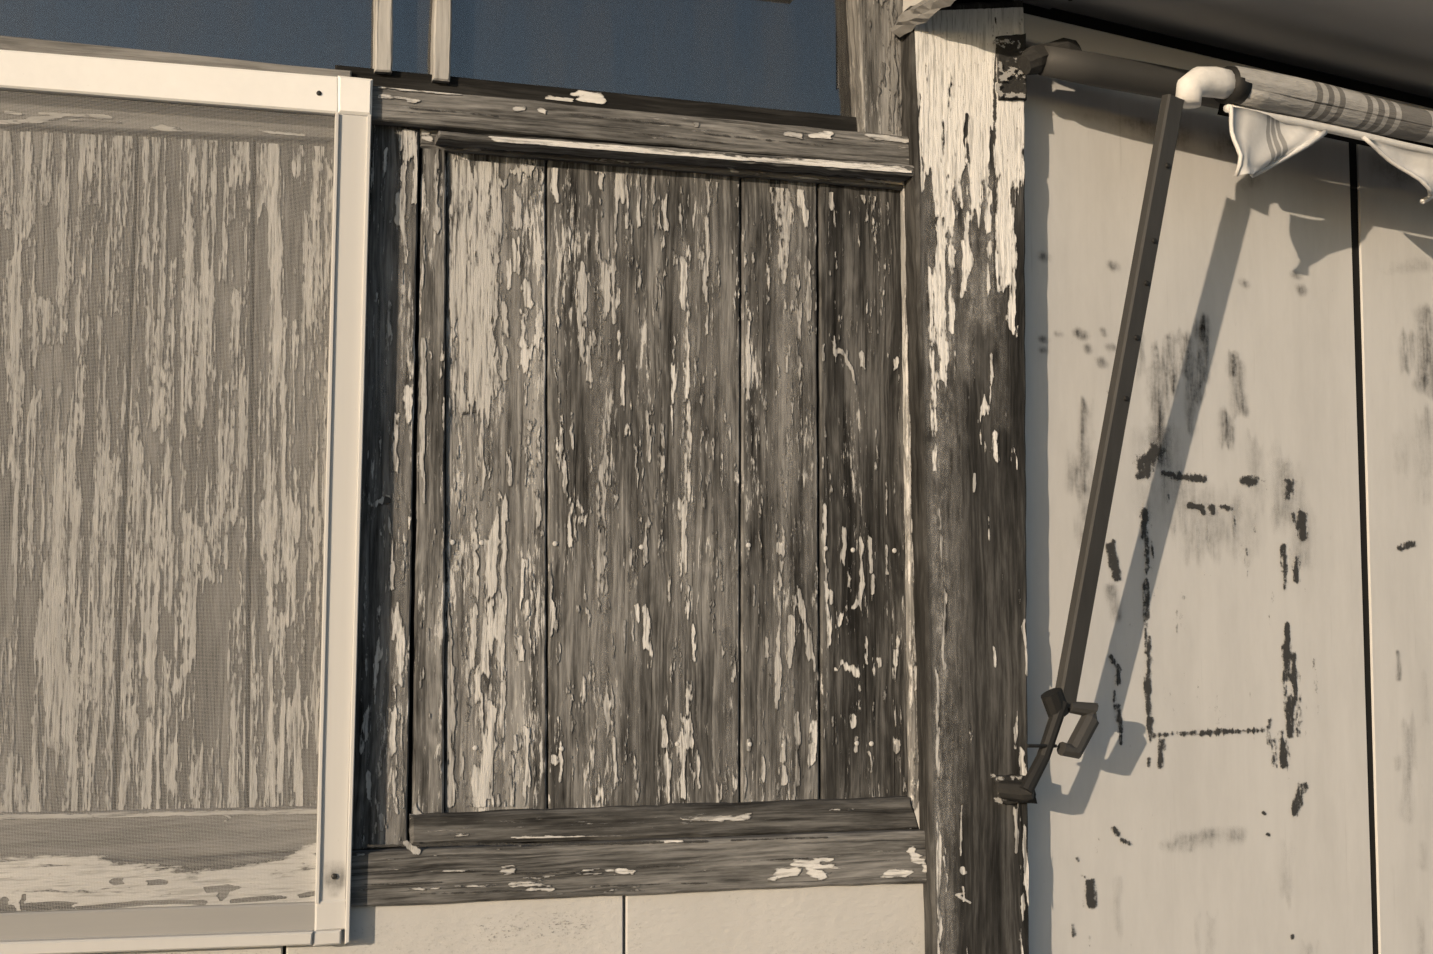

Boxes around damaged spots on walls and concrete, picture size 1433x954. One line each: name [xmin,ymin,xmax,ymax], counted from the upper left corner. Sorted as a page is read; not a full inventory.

peeling [0,105,333,821]
peeling [356,0,1028,954]
peeling [0,843,316,911]
peeling [1013,803,1029,954]